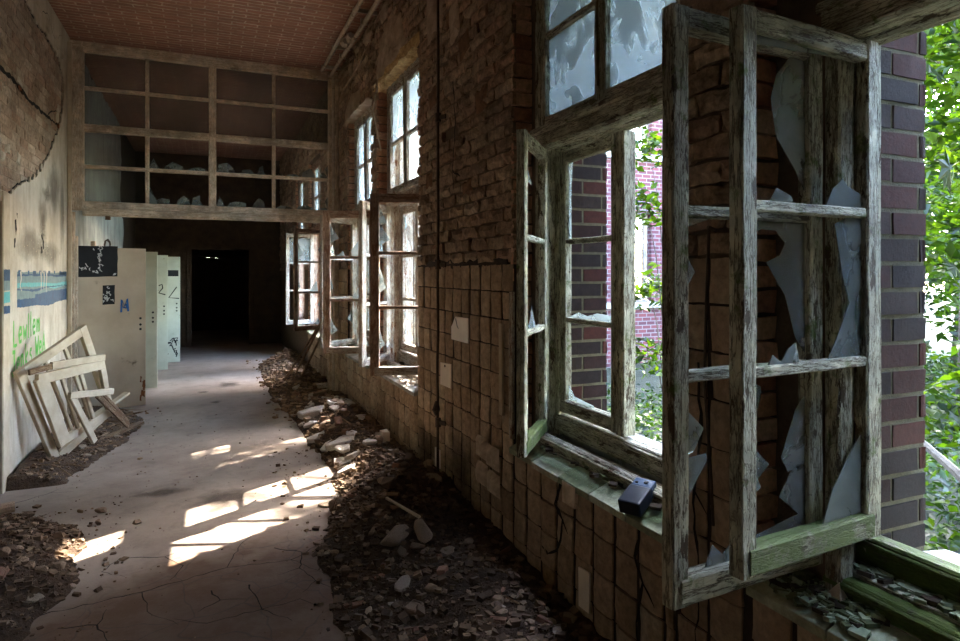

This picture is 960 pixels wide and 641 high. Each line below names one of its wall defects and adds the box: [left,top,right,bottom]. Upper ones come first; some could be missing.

flaking render [8,0,64,193]
flaking render [418,258,510,269]
crack [542,483,568,554]
crack [40,536,330,641]
crack [633,530,655,641]